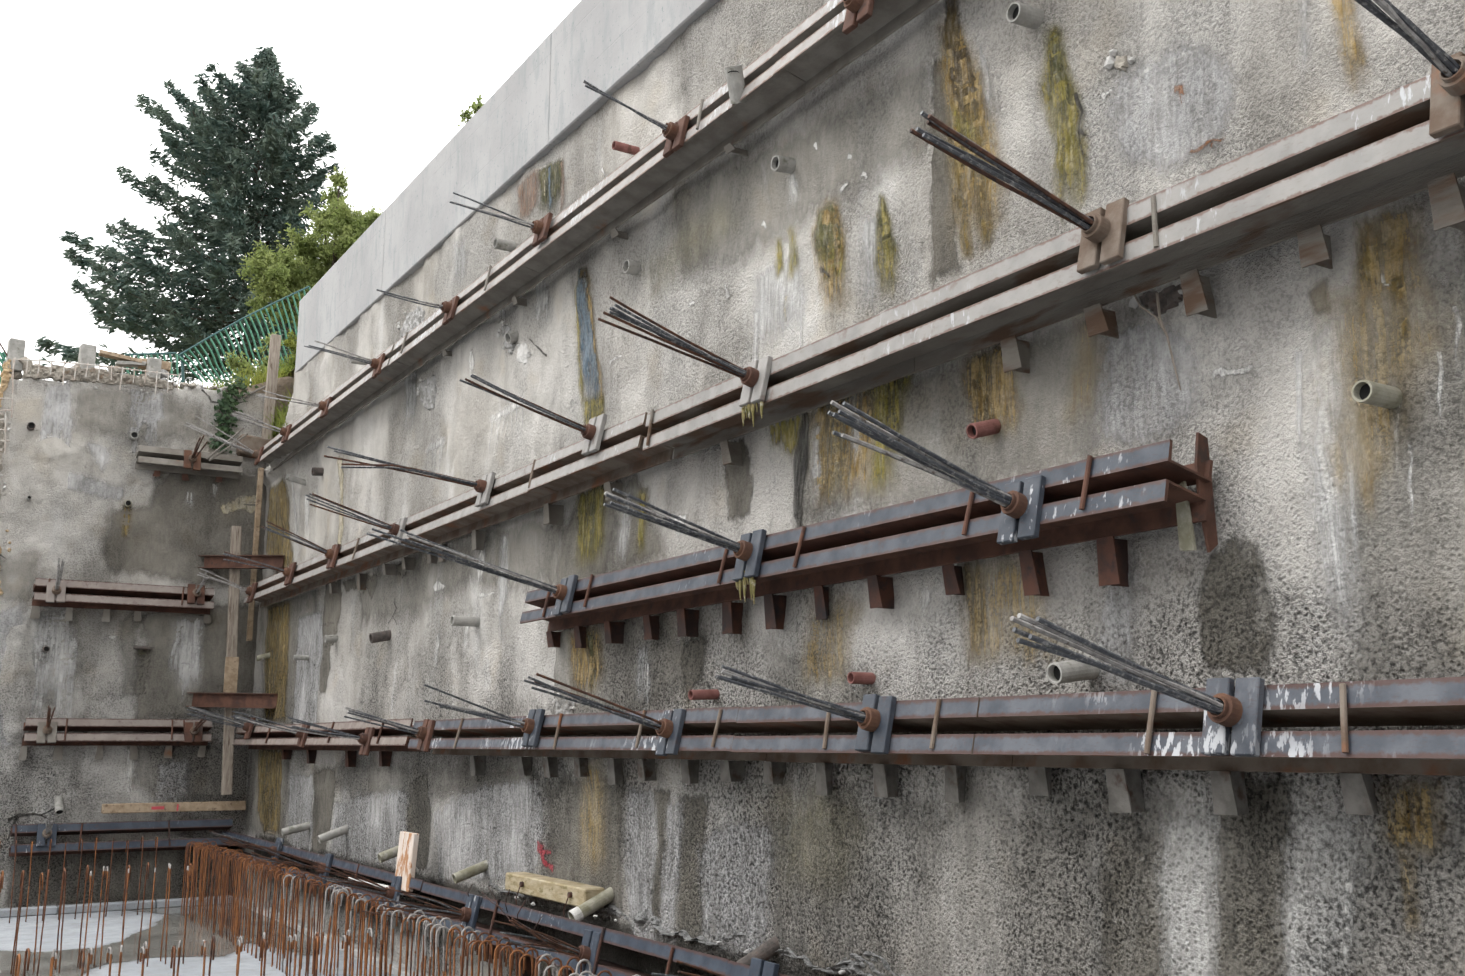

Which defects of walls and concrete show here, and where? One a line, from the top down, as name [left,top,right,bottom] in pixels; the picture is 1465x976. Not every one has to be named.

water stain [675,0,997,288]
spalling [0,357,180,498]
water stain [575,268,604,424]
water stain [1296,256,1465,681]
water stain [0,553,78,718]
water stain [41,383,661,725]
water stain [1198,539,1274,673]